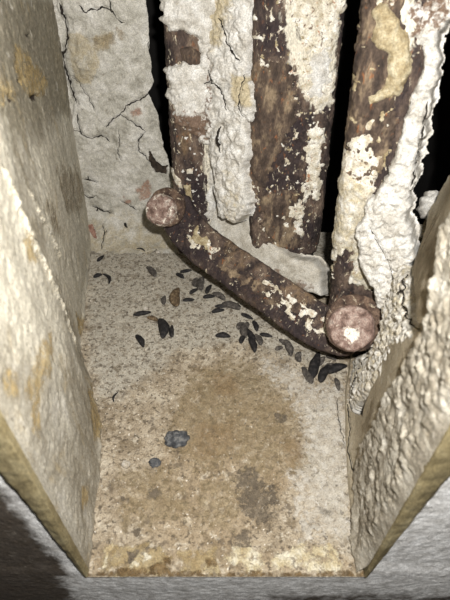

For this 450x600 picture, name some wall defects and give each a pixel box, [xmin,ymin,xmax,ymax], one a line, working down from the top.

crack [84,176,112,249]
crack [59,2,149,161]
spalling [146,0,183,188]
spalling [321,0,361,233]
spalling [412,28,450,225]
leakage [230,529,251,548]
leakage [232,467,280,530]
leakage [260,359,351,545]